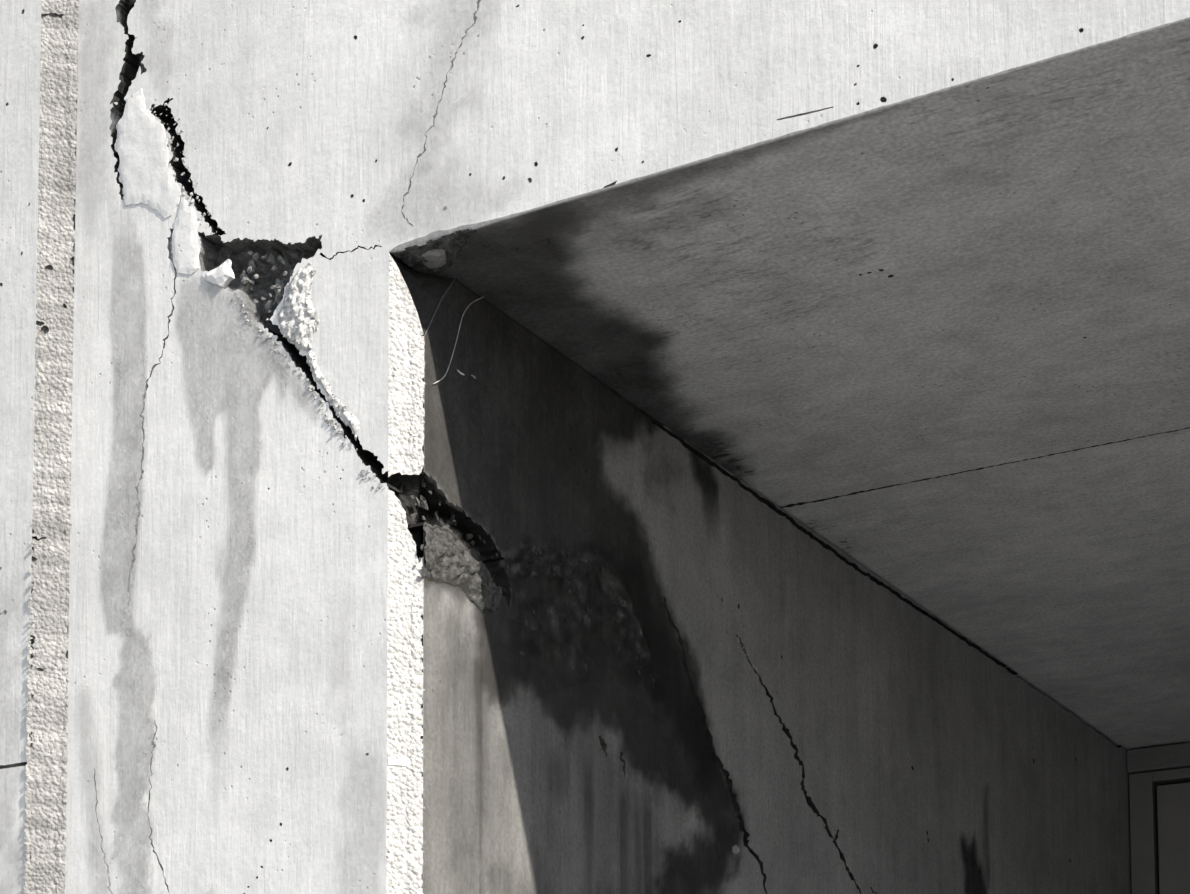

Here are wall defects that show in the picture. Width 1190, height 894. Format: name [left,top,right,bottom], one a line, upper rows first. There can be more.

damp [223,291,277,398]
crack [109,0,511,612]
damp [108,475,140,630]
damp [393,206,744,894]
crack [705,715,767,894]
crack [735,633,877,894]
damp [961,838,986,894]